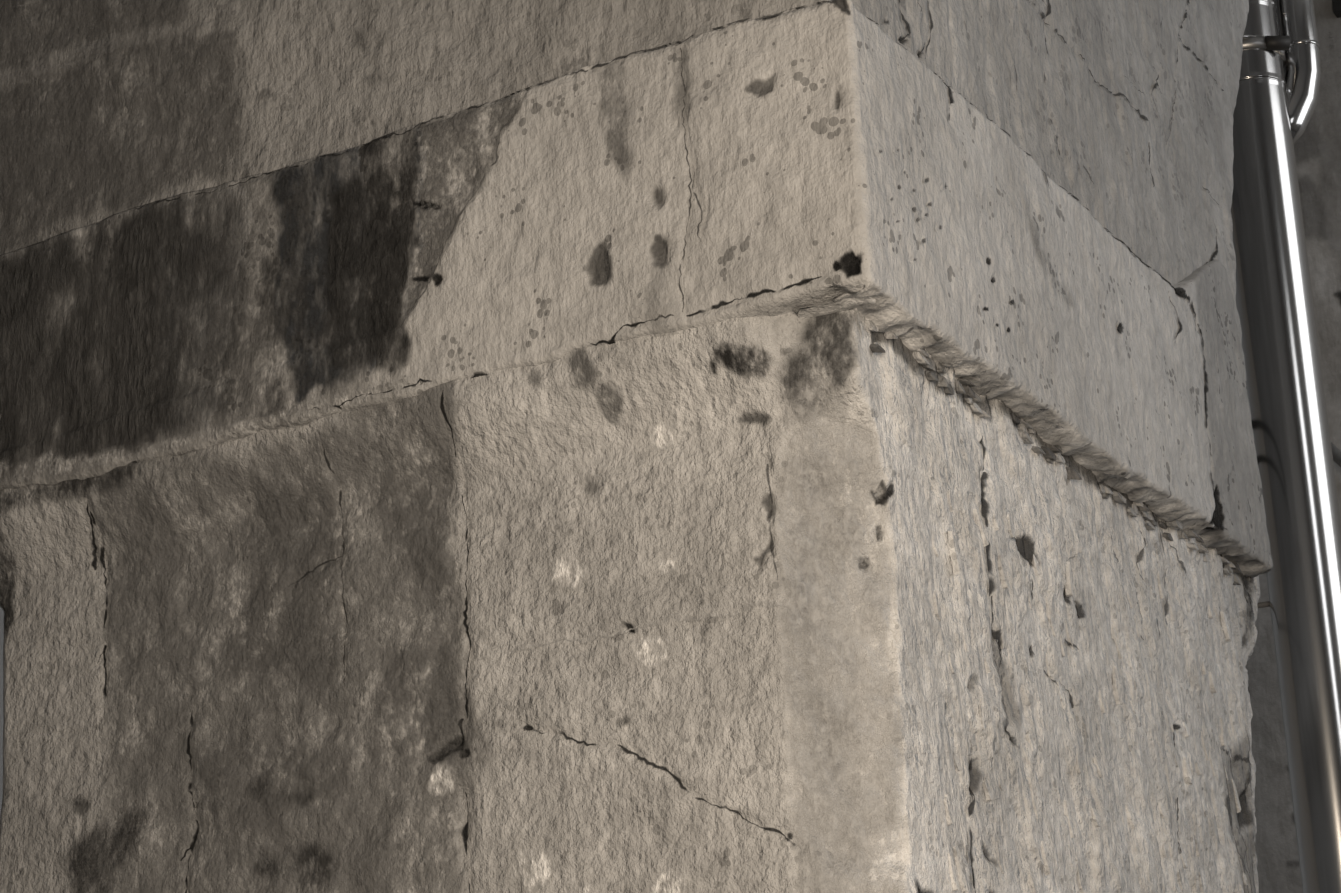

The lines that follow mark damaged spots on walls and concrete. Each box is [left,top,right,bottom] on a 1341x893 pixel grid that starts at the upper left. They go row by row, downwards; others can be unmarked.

damp [0,130,419,506]
crack [136,0,1224,520]
damp [0,537,15,630]
crack [523,725,801,848]